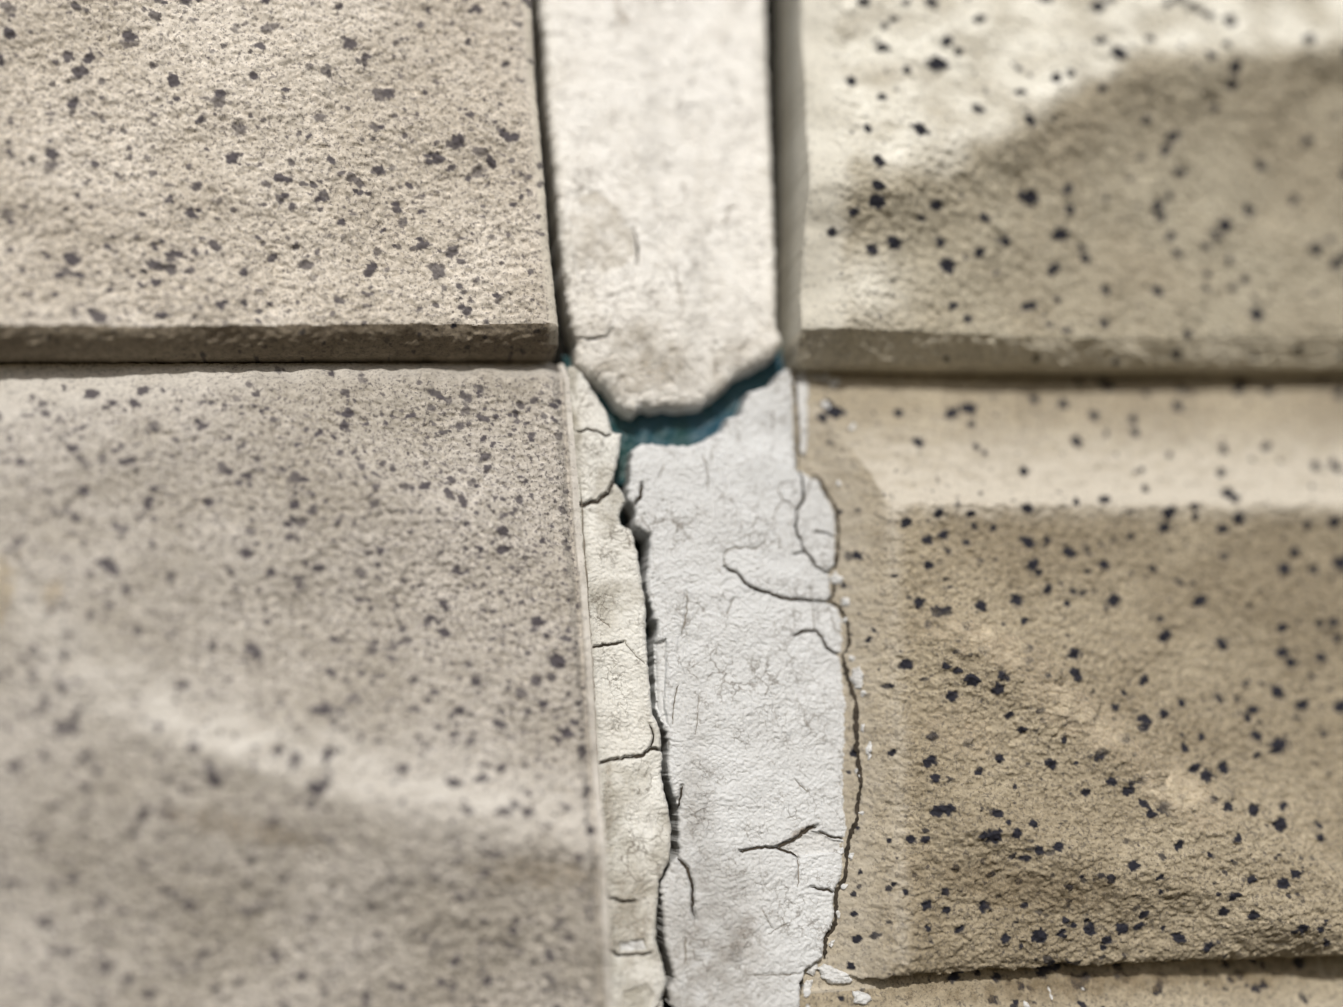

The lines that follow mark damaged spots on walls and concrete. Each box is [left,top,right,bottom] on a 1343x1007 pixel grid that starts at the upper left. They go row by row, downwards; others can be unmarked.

crack [576,429,611,437]
crack [579,465,699,783]
crack [724,373,863,976]
crack [666,786,683,810]
crack [611,858,696,1007]